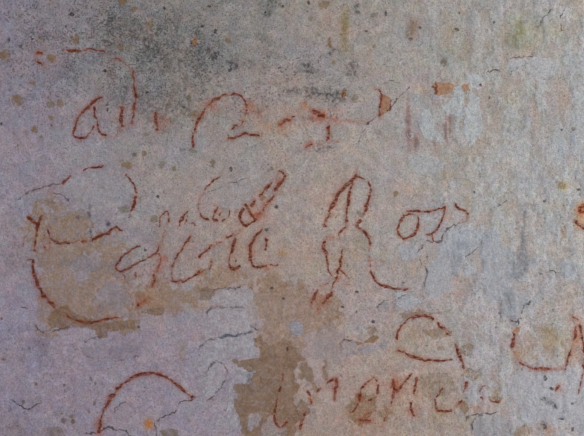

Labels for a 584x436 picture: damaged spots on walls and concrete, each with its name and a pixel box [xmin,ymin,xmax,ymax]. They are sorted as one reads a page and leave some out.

peeling [441,74,485,147]
crack [200,325,257,347]